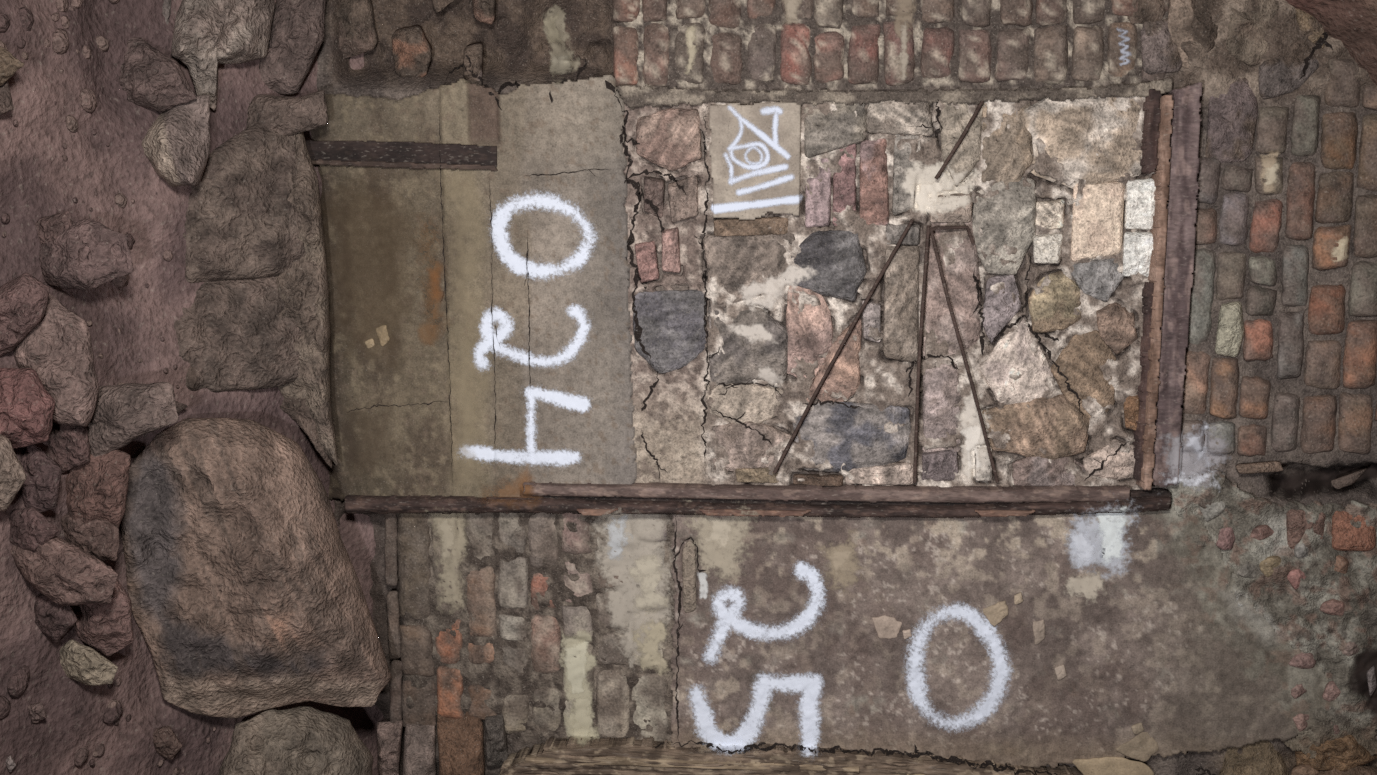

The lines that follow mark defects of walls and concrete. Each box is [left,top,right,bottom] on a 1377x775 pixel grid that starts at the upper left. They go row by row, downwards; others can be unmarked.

crack [347,49,862,481]
damp [1160,422,1228,488]
spalling [1235,461,1377,498]
damp [1066,507,1137,599]